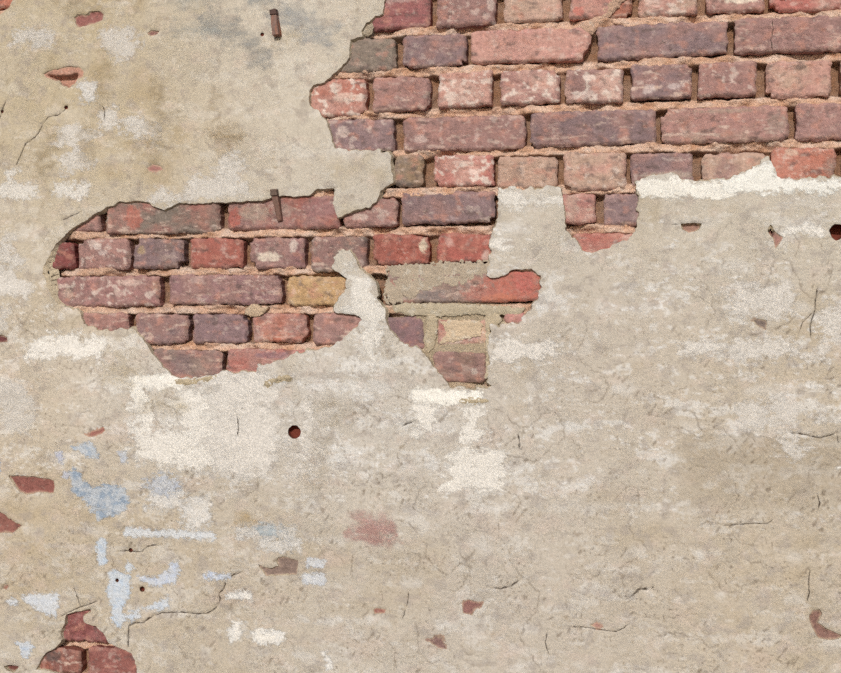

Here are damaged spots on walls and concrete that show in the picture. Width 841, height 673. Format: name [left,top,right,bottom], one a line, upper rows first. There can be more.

flaking render [42,0,841,390]
flaking render [9,471,70,495]
flaking render [0,512,22,533]
flaking render [36,609,137,673]